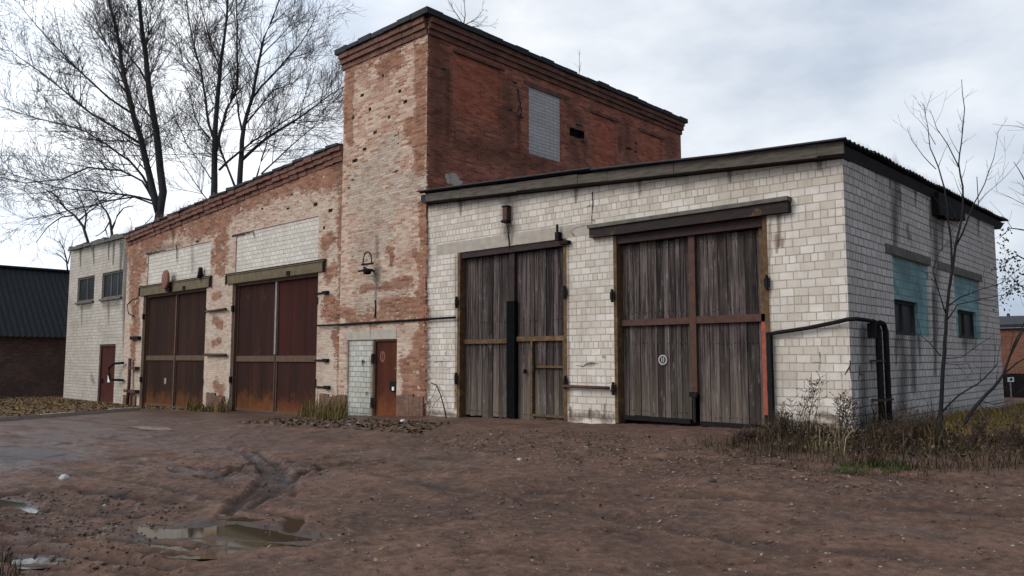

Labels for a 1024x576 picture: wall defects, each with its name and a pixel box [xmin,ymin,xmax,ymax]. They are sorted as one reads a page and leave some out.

peeling [125,18,435,404]